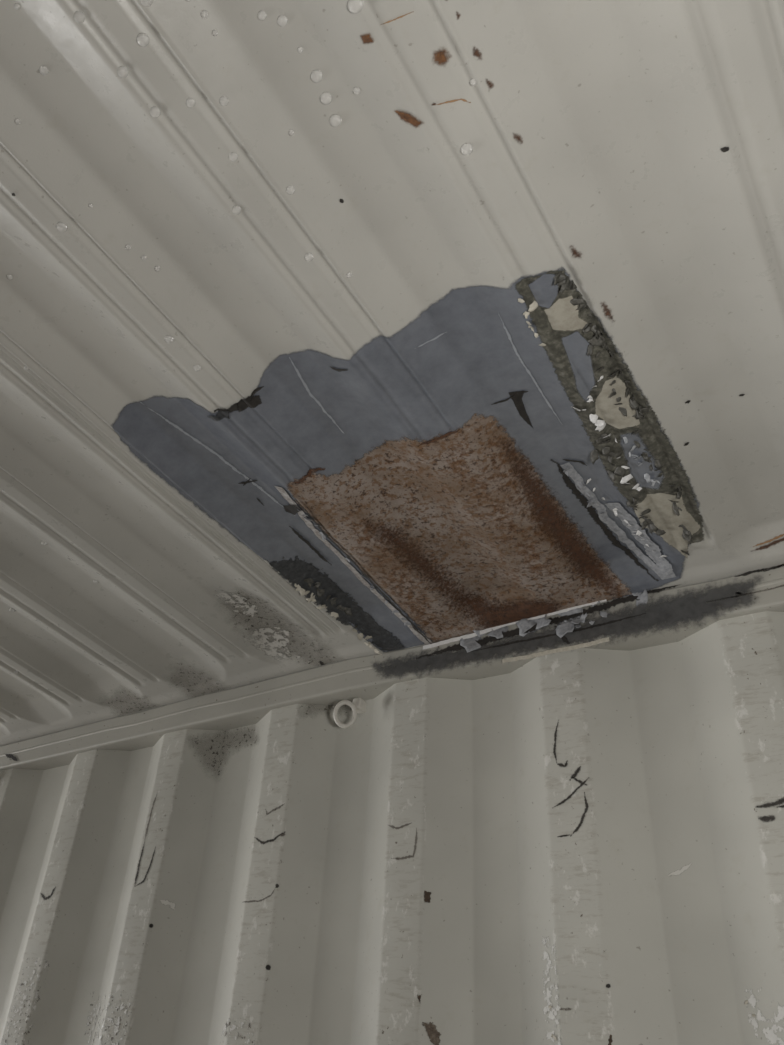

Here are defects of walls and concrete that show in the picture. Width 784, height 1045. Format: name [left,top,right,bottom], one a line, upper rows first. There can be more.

peeling [515,269,705,558]
rust [287,413,632,643]
peeling [215,590,301,660]
peeling [269,556,405,655]
peeling [571,611,609,628]
peeling [745,989,784,1045]